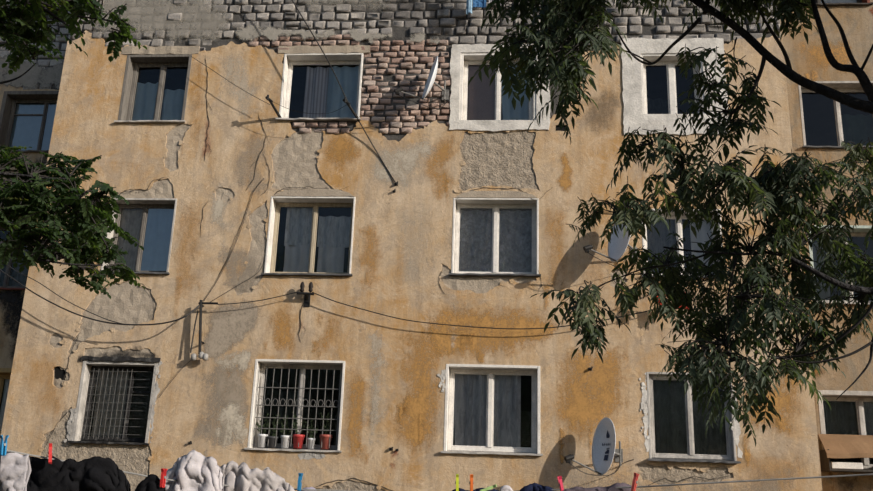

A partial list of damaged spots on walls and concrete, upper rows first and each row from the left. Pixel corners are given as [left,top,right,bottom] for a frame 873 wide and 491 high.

crack [204,55,212,161]
crack [219,114,350,274]
spalling [271,128,333,192]
spalling [454,130,540,193]
spalling [219,201,268,296]
spalling [39,281,162,491]
peeling [216,403,248,447]
peeling [639,372,650,452]
peeling [730,390,743,458]
spalling [637,463,735,485]